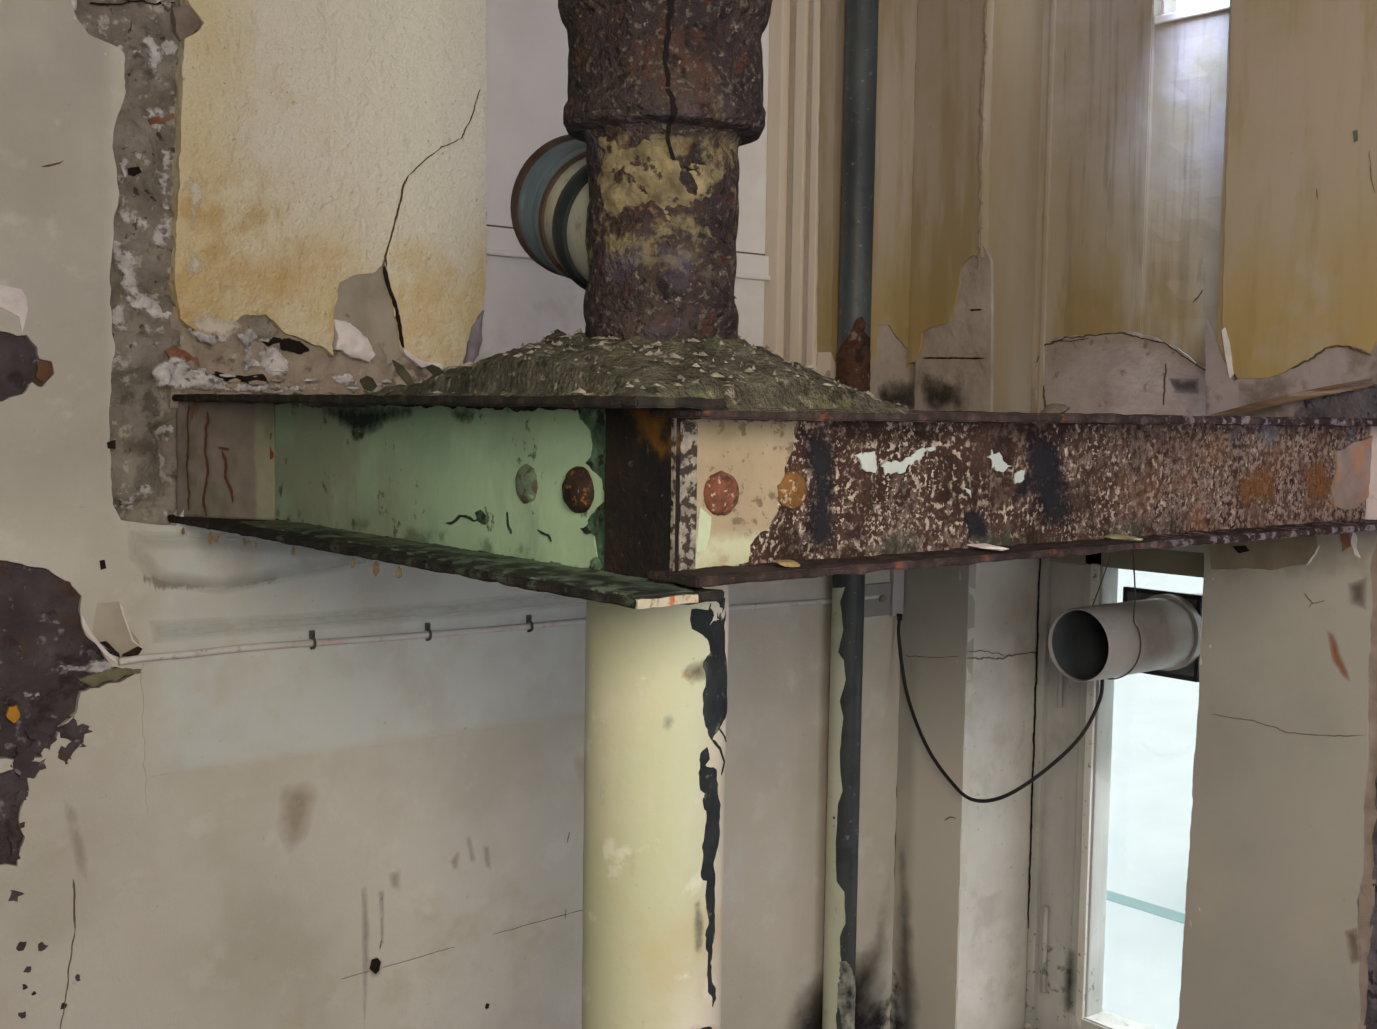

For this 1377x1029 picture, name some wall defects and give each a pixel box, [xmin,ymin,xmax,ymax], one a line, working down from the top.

spalling [171,5,202,42]
spalling [148,113,174,125]
spalling [127,166,141,177]
crack [383,90,480,348]
peeling [870,0,994,412]
water stain [194,315,238,337]
spalling [152,266,484,408]
peeling [1033,319,1377,417]
spalling [0,560,142,865]
crack [1213,714,1359,737]
peeling [690,598,727,1007]
peeling [8,890,24,902]